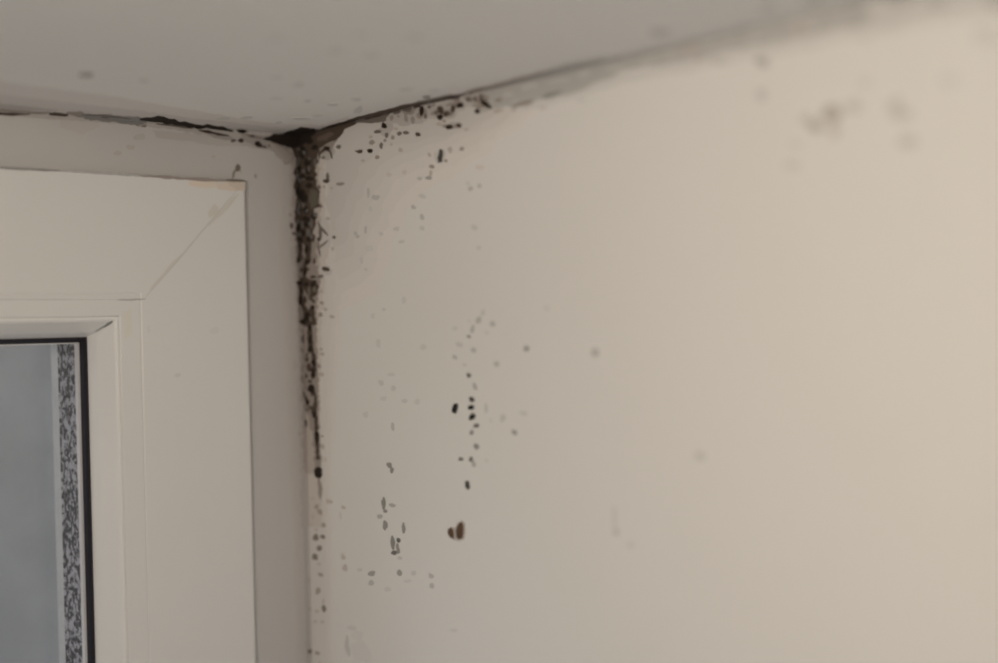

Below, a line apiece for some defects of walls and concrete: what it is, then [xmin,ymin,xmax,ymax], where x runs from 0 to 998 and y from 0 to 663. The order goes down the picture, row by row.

damp [298,234,310,262]
mould [452,309,506,467]
mould [377,497,416,583]